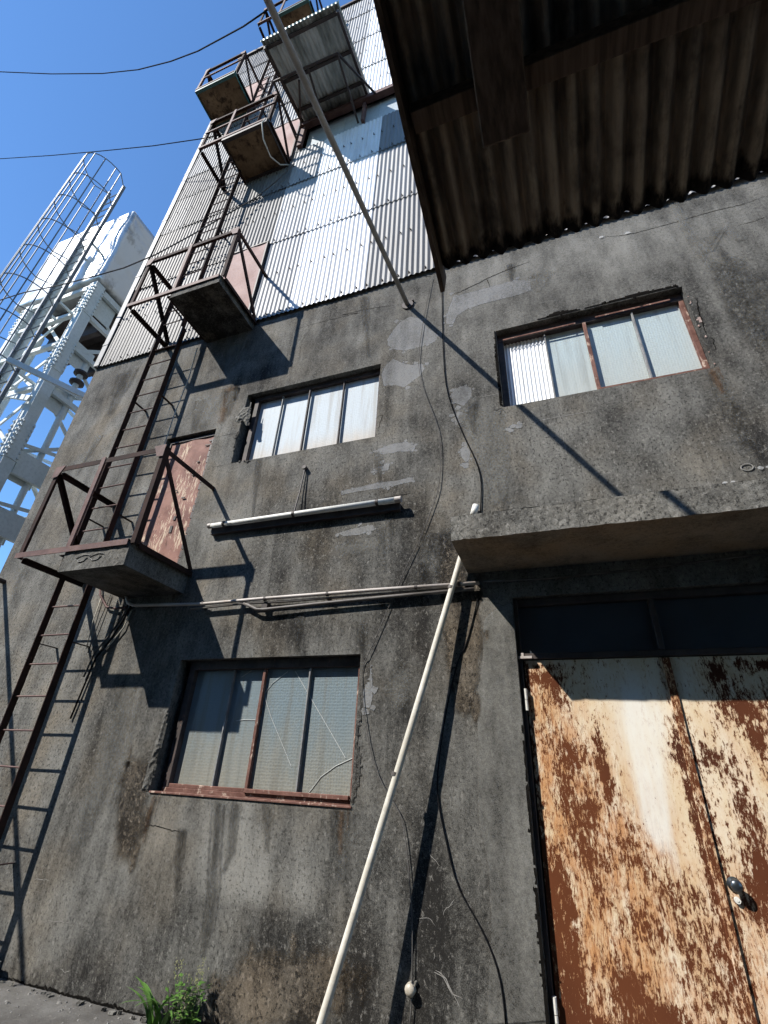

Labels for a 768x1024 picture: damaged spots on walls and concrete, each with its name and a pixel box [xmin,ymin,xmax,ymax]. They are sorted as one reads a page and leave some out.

flaking render [382,277,536,389]
leakage [73,688,151,873]
spalling [351,657,407,804]
leakage [175,830,186,885]
leakage [202,803,238,952]
leakage [205,933,370,1024]